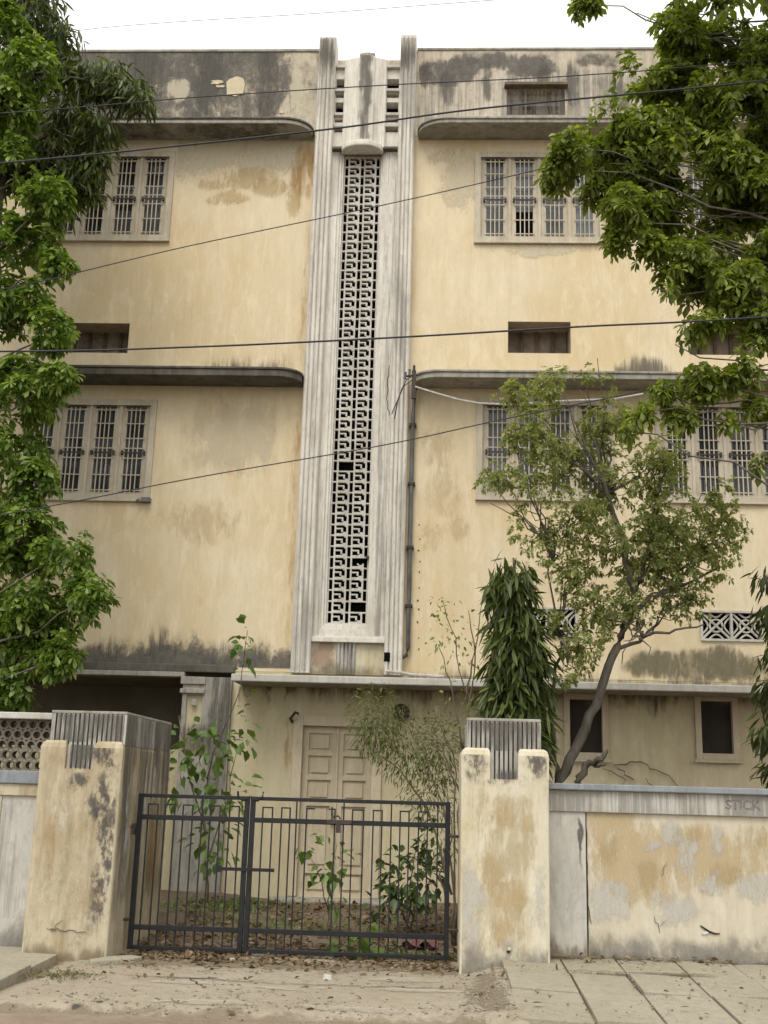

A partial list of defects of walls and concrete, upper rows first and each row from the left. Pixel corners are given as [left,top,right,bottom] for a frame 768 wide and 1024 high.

water stain [34,52,293,139]
peeling [167,79,189,102]
peeling [211,76,245,96]
water stain [400,46,615,106]
water stain [615,358,666,372]
water stain [309,673,469,701]
water stain [608,646,768,712]
water stain [468,721,547,775]
water stain [55,634,291,921]